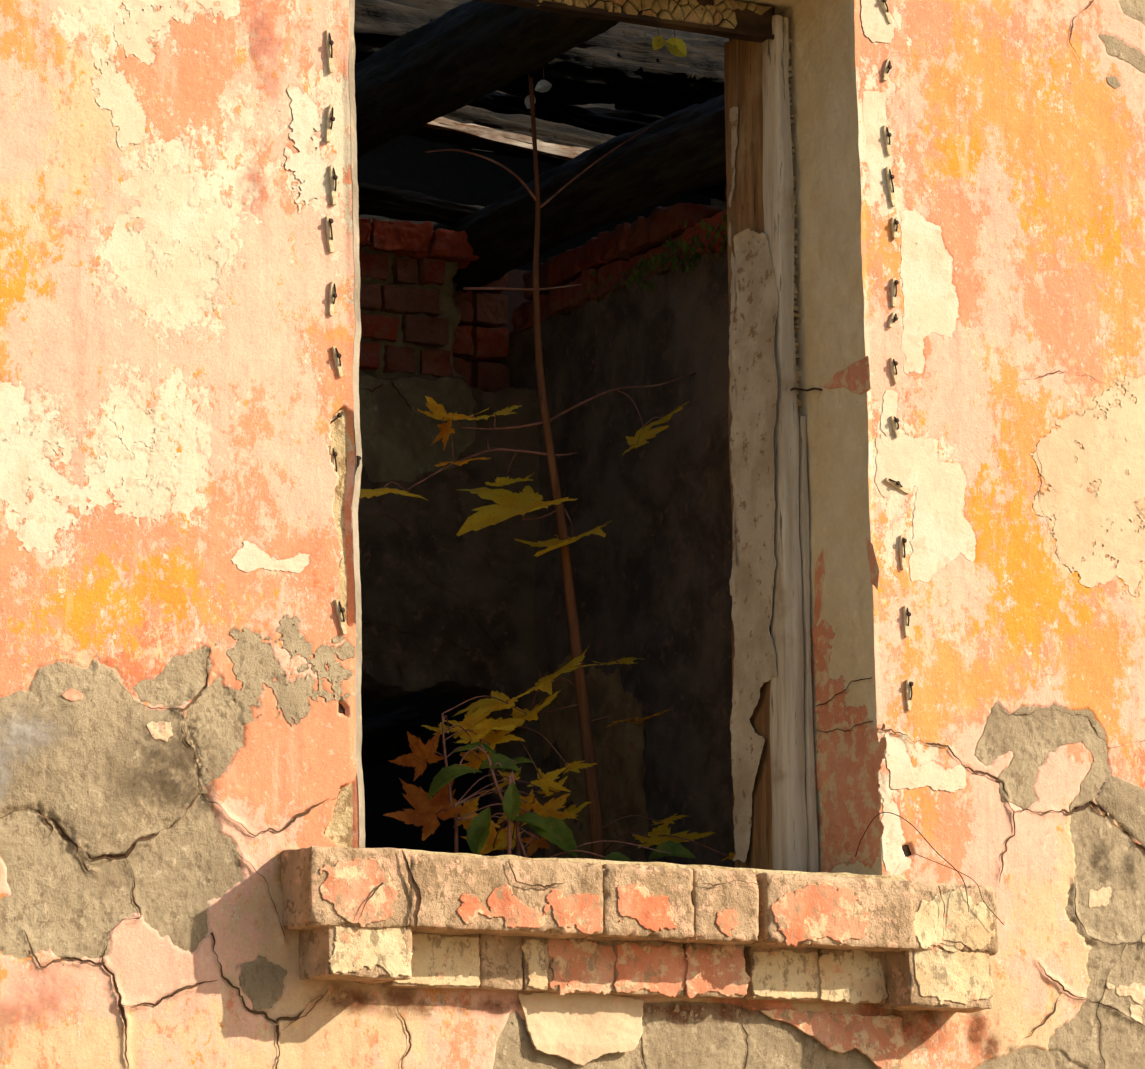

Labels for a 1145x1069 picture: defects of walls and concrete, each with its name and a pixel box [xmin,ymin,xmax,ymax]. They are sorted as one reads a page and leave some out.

crack [1069,0,1097,84]
peeling [728,222,778,863]
peeling [1030,375,1145,599]
crack [0,649,342,1069]
flaking render [0,375,478,961]
crack [397,1009,412,1069]
flaking render [319,549,967,1069]
crack [938,886,967,947]
peeling [913,889,996,1005]
crack [816,677,1145,883]
flaking render [974,702,1145,1069]
crack [1019,862,1145,1068]